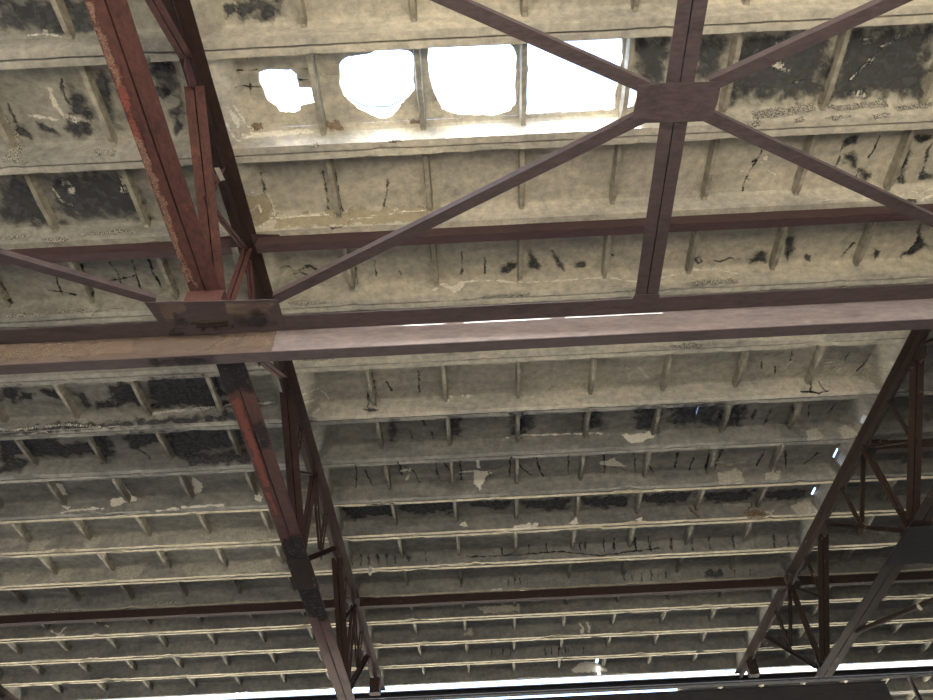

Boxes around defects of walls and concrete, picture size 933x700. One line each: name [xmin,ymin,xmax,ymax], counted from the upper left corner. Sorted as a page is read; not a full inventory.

damp [635,38,670,84]
damp [696,34,727,79]
damp [730,25,933,105]
damp [8,103,33,140]
damp [27,78,93,137]
damp [96,71,112,120]
damp [0,175,47,227]
damp [51,171,146,223]
damp [431,250,637,294]
damp [0,374,251,515]
crack [397,461,462,483]
crack [467,536,660,558]